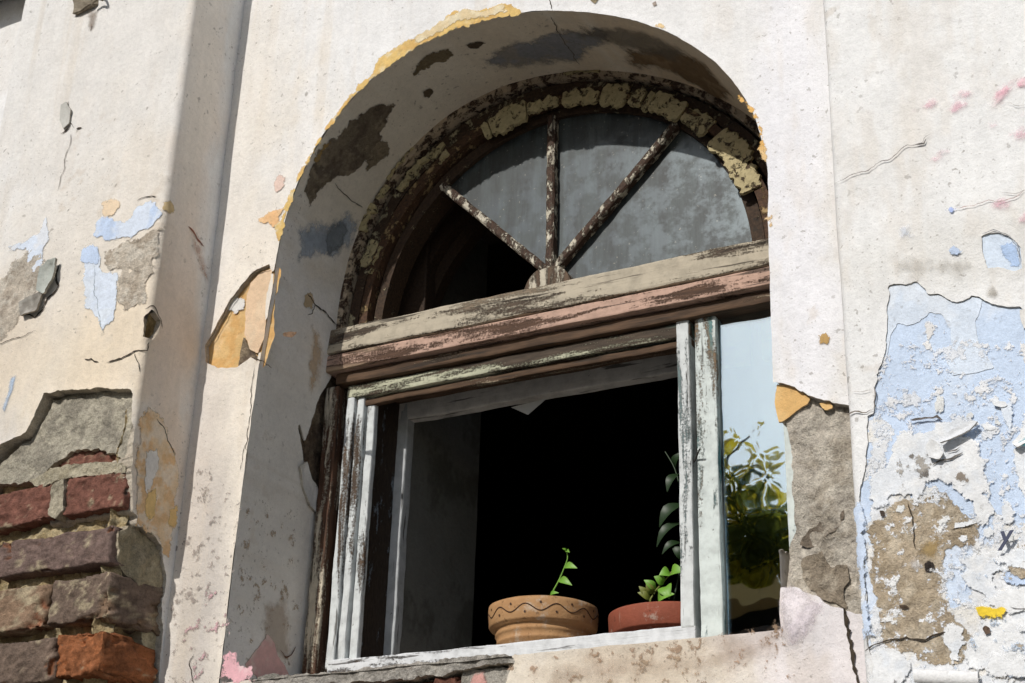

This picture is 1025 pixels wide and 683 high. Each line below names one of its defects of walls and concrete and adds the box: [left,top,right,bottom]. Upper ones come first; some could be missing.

crack [549,0,583,65]
damp [489,28,731,99]
flaking render [258,3,521,274]
crack [835,135,928,184]
flaking render [0,218,60,341]
flaking render [80,196,175,338]
flaking render [209,263,297,369]
flaking render [0,391,179,683]
peeling [775,282,1025,683]
flaking render [221,635,515,683]